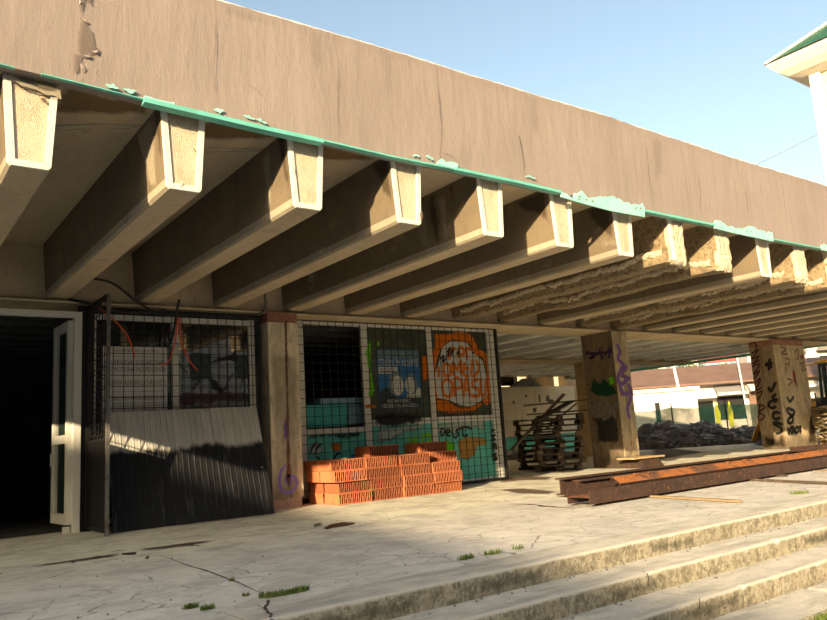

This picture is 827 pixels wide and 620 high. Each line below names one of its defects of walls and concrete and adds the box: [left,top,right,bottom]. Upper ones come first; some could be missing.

peeling [74,0,100,73]
peeling [560,191,645,217]
spalling [460,220,774,320]
spalling [583,244,827,327]
crack [32,529,309,620]